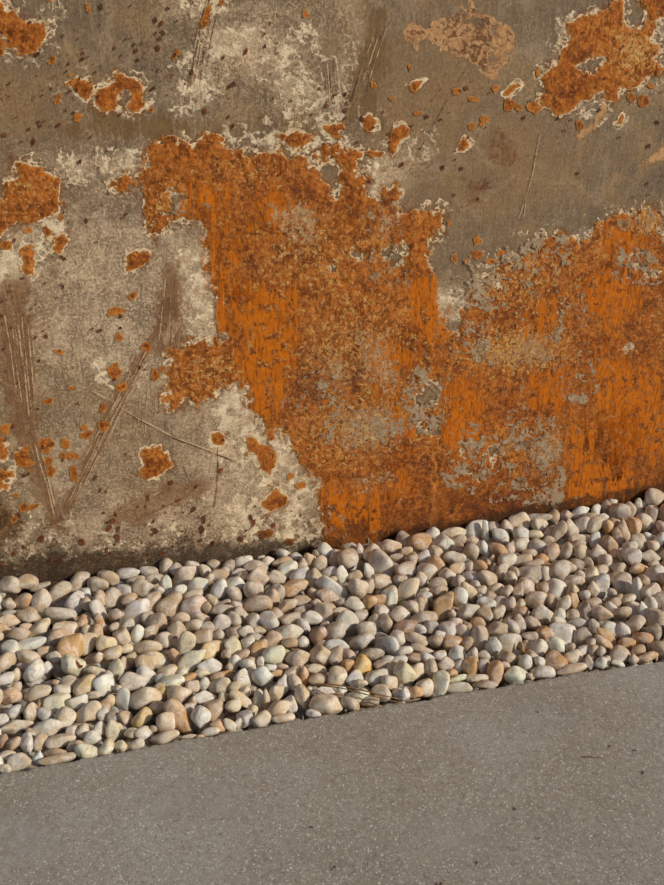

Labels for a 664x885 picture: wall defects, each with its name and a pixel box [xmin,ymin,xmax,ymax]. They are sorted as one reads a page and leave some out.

peeling [403,0,516,80]
peeling [545,10,575,53]
corrosion [0,0,160,285]
peeling [574,98,609,140]
peeling [639,147,664,168]
corrosion [100,0,664,559]
corrosion [32,511,129,564]